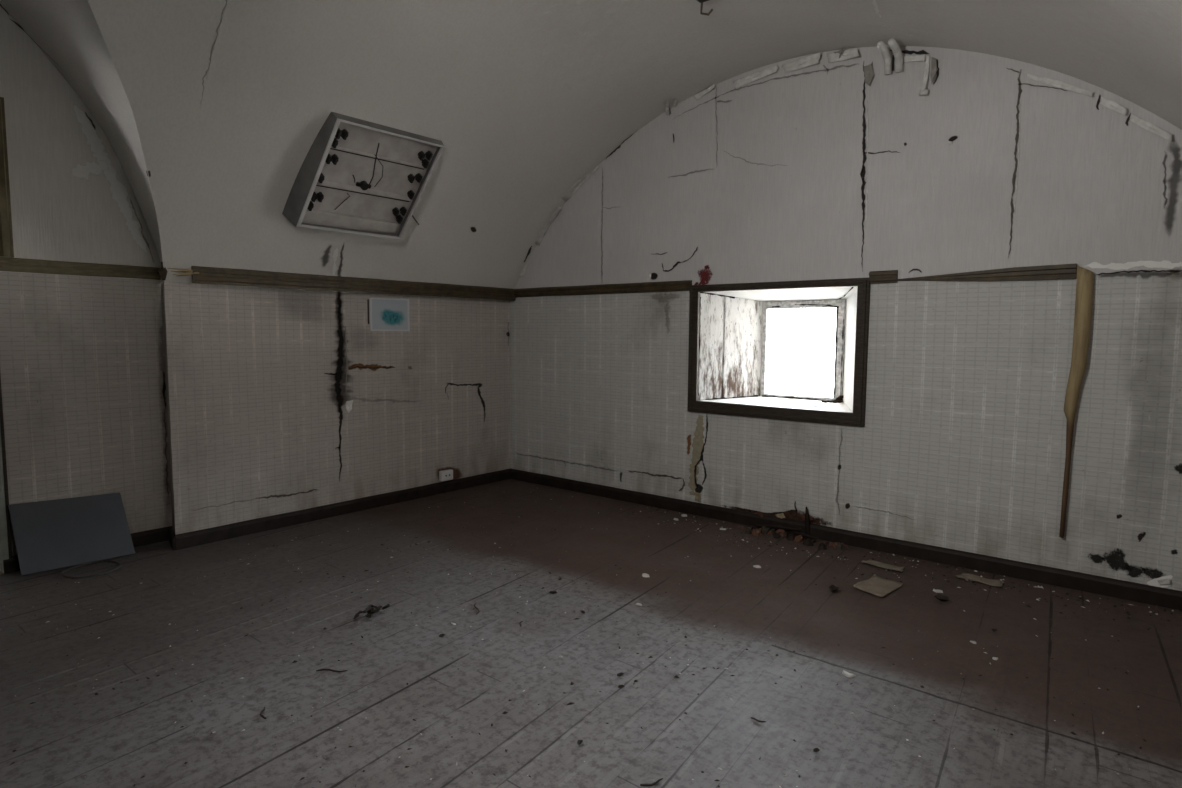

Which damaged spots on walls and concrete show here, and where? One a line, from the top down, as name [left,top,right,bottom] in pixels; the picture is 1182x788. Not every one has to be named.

crack [620,62,899,493]
peeling [903,54,939,96]
crack [1007,68,1067,254]
damp [1163,146,1182,229]
crack [256,291,353,499]
crack [445,383,485,421]